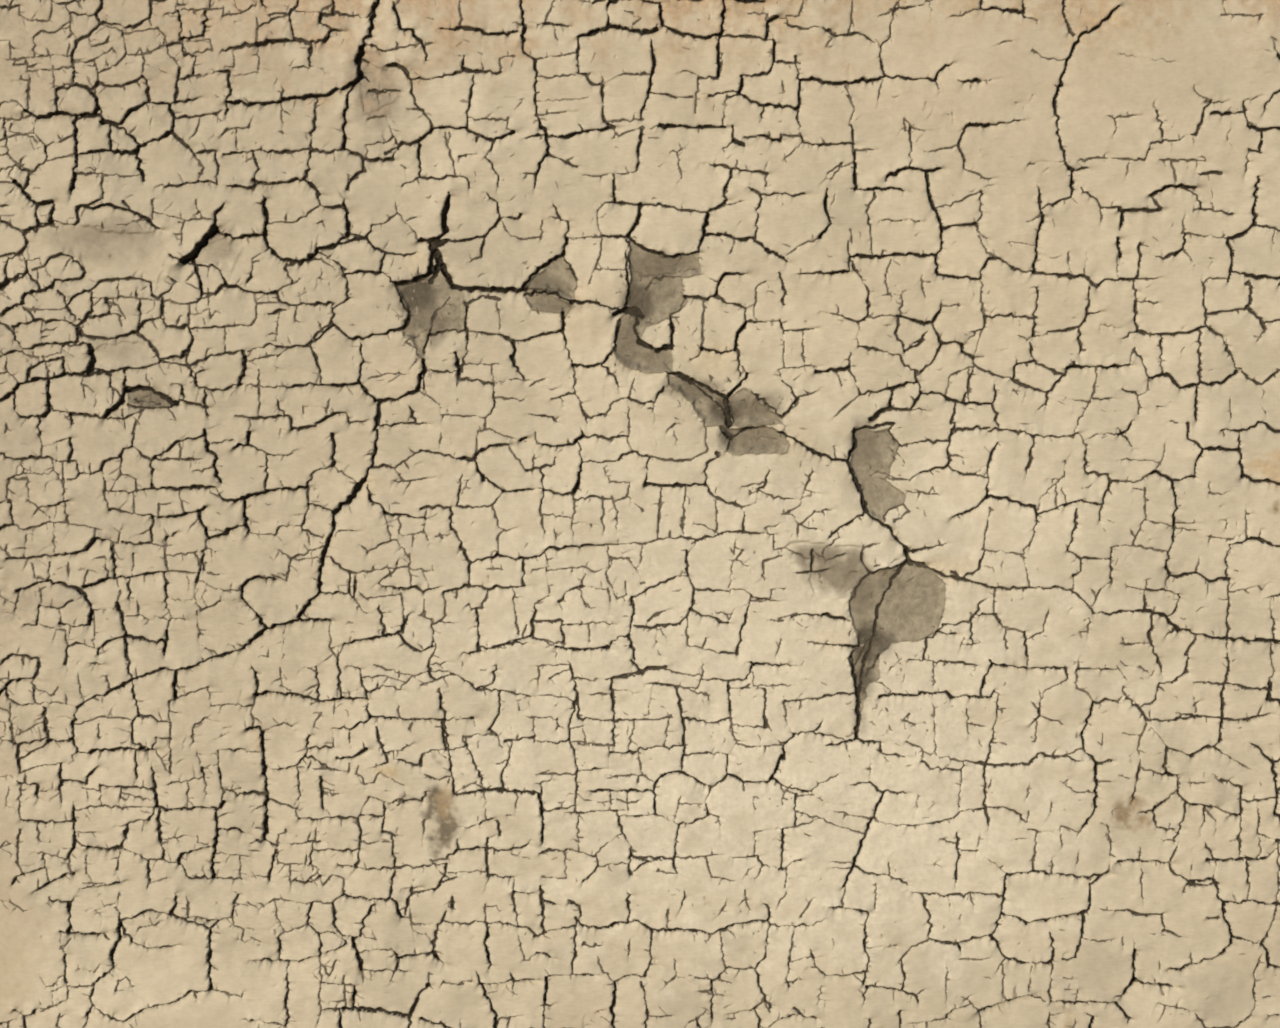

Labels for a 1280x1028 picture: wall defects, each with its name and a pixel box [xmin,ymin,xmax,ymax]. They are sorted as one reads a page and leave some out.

crack [536,0,569,41]
crack [950,0,1038,25]
peeling [392,270,470,364]
peeling [520,252,582,323]
peeling [609,235,795,460]
crack [777,272,788,305]
crack [742,461,831,537]
peeling [846,424,910,526]
crack [770,612,850,629]
peeling [773,537,951,743]
crack [939,832,980,883]
crack [1099,907,1182,937]